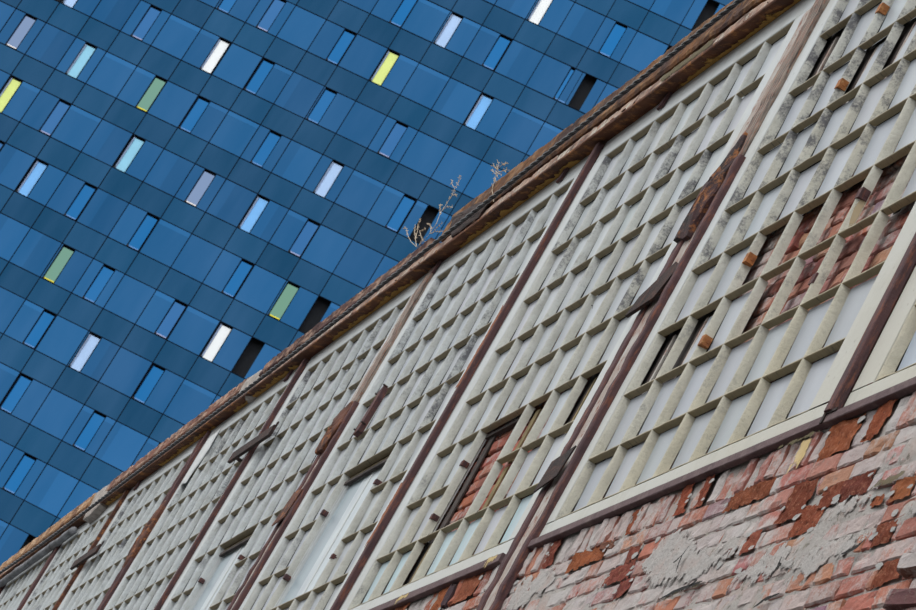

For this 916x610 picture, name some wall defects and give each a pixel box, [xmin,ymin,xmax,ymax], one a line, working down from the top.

corrosion [673,132,748,243]
corrosion [315,401,353,455]
spalling [816,399,898,462]
peeling [507,538,612,610]
spalling [624,507,643,537]
peeling [601,528,763,600]
spalling [671,475,715,517]
peeling [722,470,916,591]